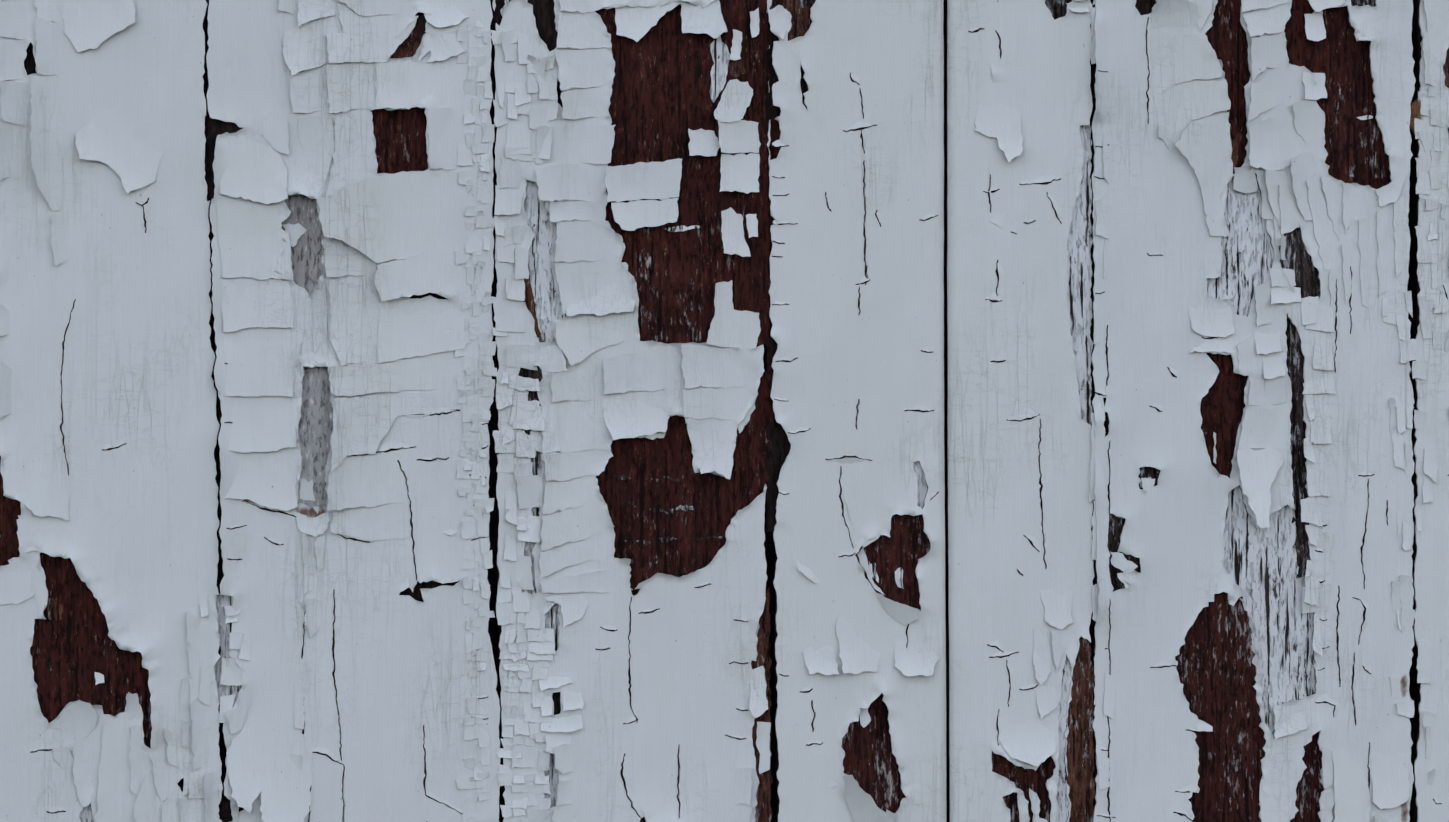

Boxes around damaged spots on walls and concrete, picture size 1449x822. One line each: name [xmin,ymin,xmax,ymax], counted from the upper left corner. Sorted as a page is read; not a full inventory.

peeling [0,0,162,266]
peeling [0,451,152,749]
peeling [178,590,313,822]
peeling [204,0,816,822]
peeling [802,461,939,677]
peeling [841,693,906,822]
peeling [992,125,1140,822]
peeling [1135,0,1449,822]